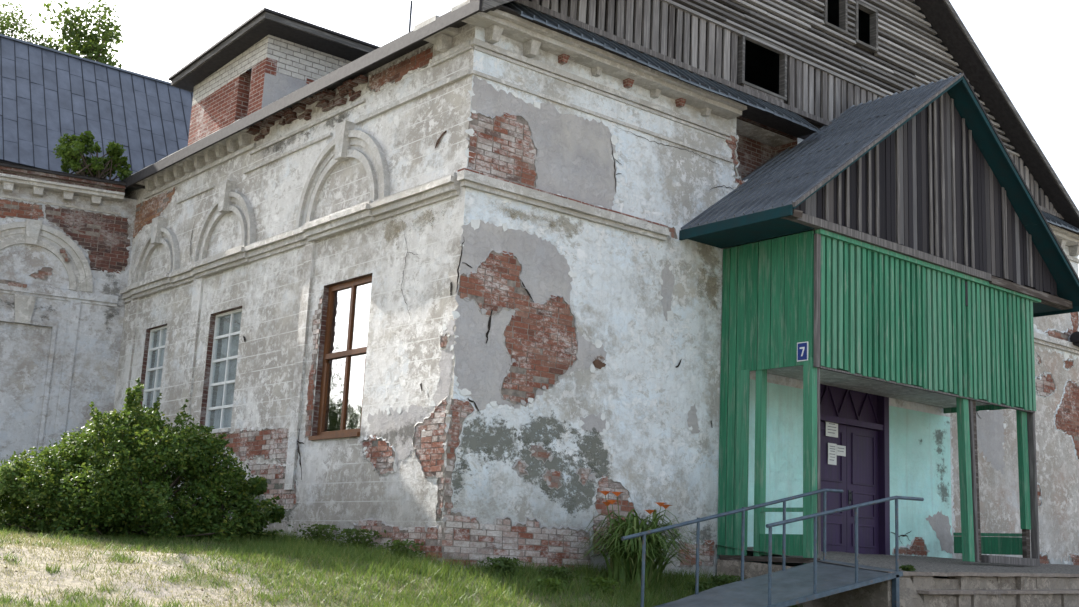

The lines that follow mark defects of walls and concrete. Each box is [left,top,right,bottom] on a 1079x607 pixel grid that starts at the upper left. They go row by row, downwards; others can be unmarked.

spalling [366,44,436,94]
peeling [465,76,618,210]
spalling [0,266,53,288]
spalling [0,186,178,275]
spalling [203,296,323,511]
peeling [353,219,636,572]
damp [452,410,611,514]
peeling [892,413,962,556]
peeling [976,312,1079,565]